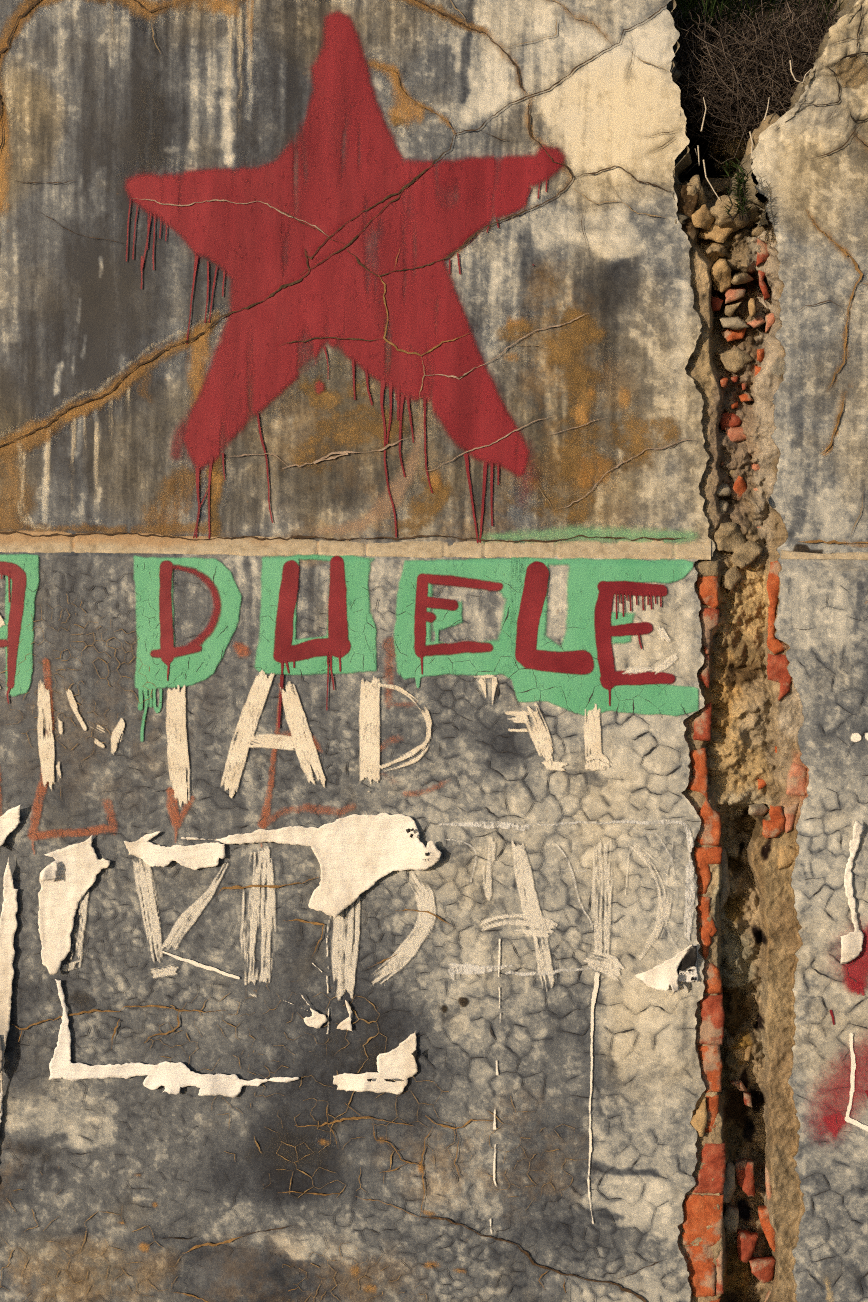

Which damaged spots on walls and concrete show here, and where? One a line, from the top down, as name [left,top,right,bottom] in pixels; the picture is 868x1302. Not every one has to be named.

crack [0,439,700,1302]
spalling [673,178,833,1302]
crack [788,583,868,1302]
crack [798,210,864,454]
crack [799,489,868,544]
crack [801,14,868,160]